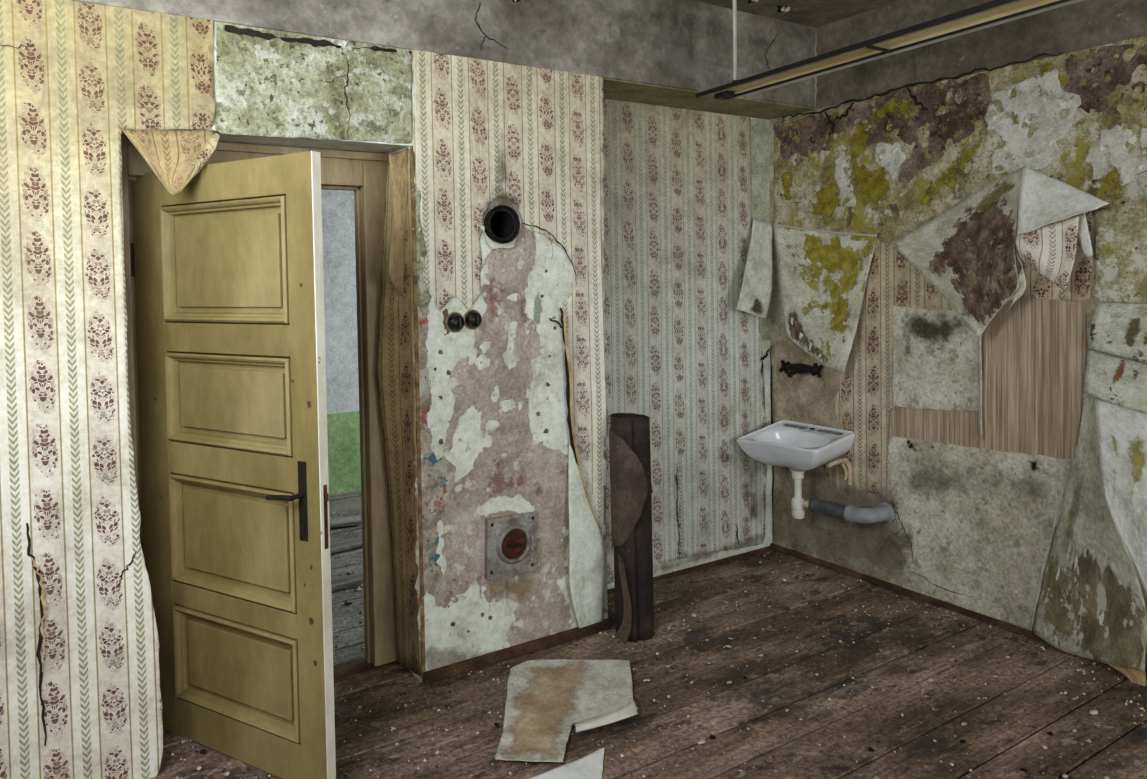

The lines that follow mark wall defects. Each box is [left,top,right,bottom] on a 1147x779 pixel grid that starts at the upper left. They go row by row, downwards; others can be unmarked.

peeling [751,35,1147,244]
peeling [413,186,573,647]
damp [1042,490,1145,670]